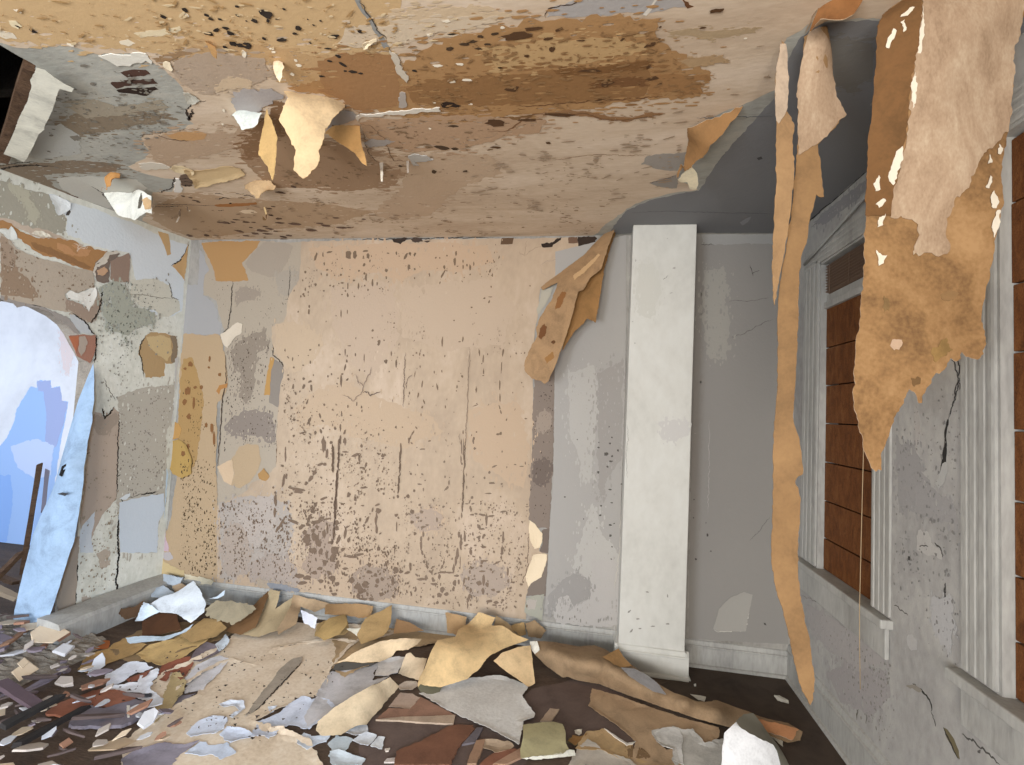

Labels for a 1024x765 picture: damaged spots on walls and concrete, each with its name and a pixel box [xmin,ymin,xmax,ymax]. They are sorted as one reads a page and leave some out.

crack [355,0,390,49]
flaking render [327,110,356,130]
peeling [0,226,17,240]
flaking render [79,357,192,561]
flaking render [49,162,245,363]
crack [343,355,412,402]
damp [0,0,762,630]
flaking render [524,20,879,644]
crack [940,359,961,470]